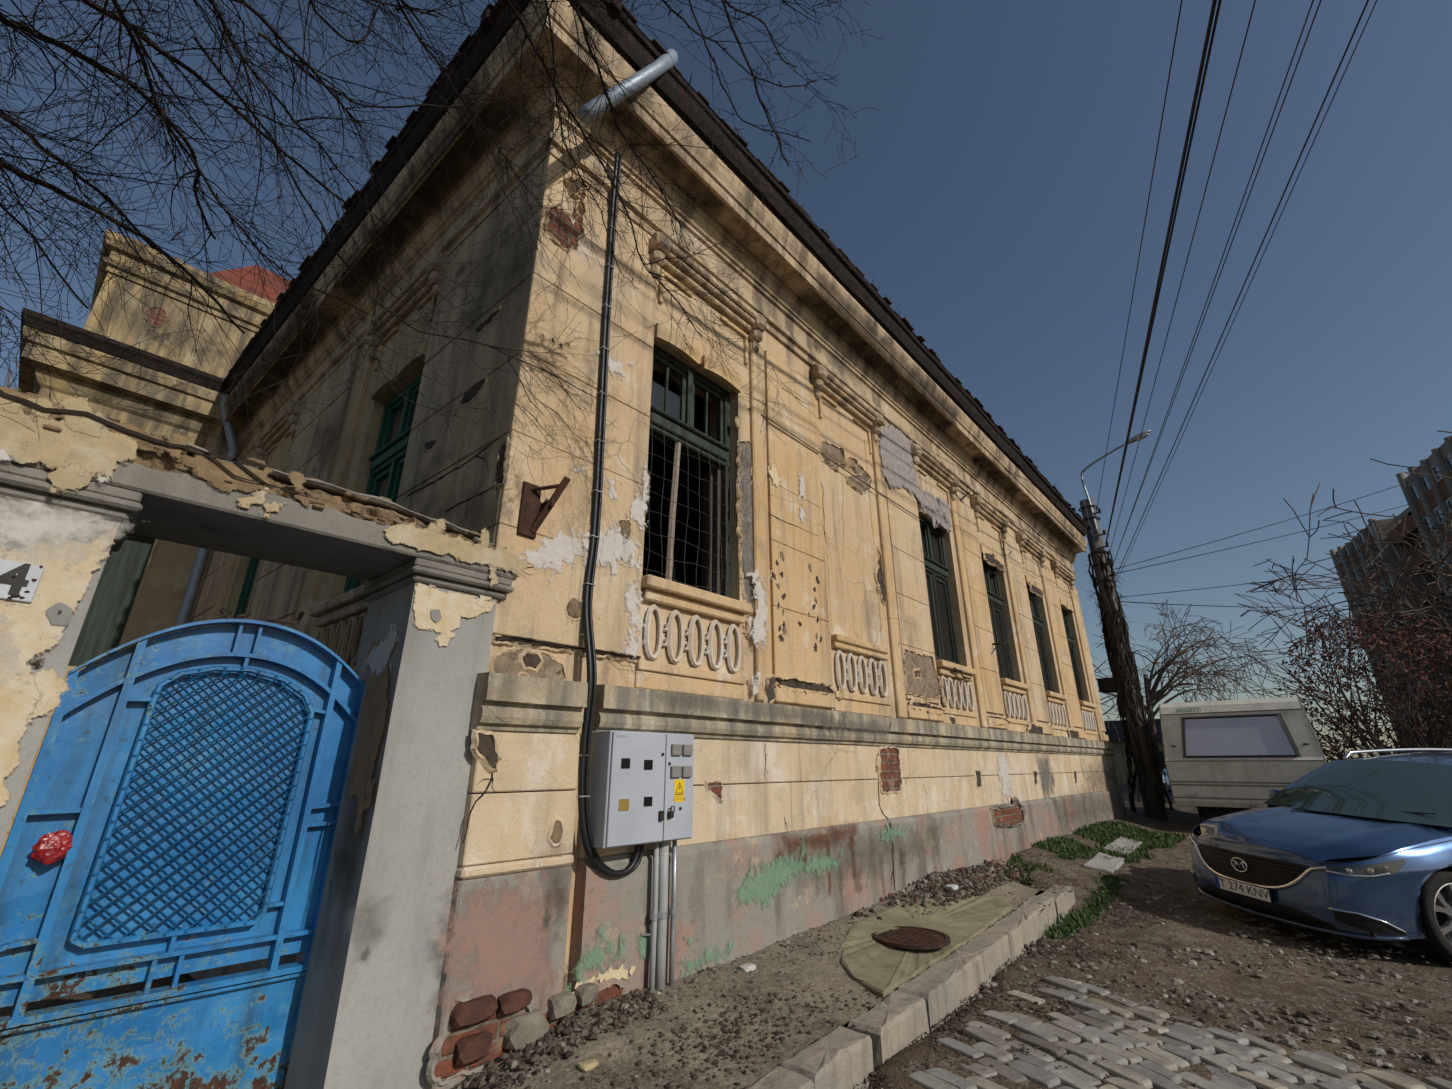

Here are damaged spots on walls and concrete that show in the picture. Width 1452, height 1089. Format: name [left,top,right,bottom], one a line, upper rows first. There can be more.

flaking render [542,175,587,254]
peeling [820,423,951,532]
peeling [735,416,822,653]
peeling [0,391,202,807]
peeling [235,463,650,841]
flaking render [875,746,902,795]
flaking render [990,796,1026,829]